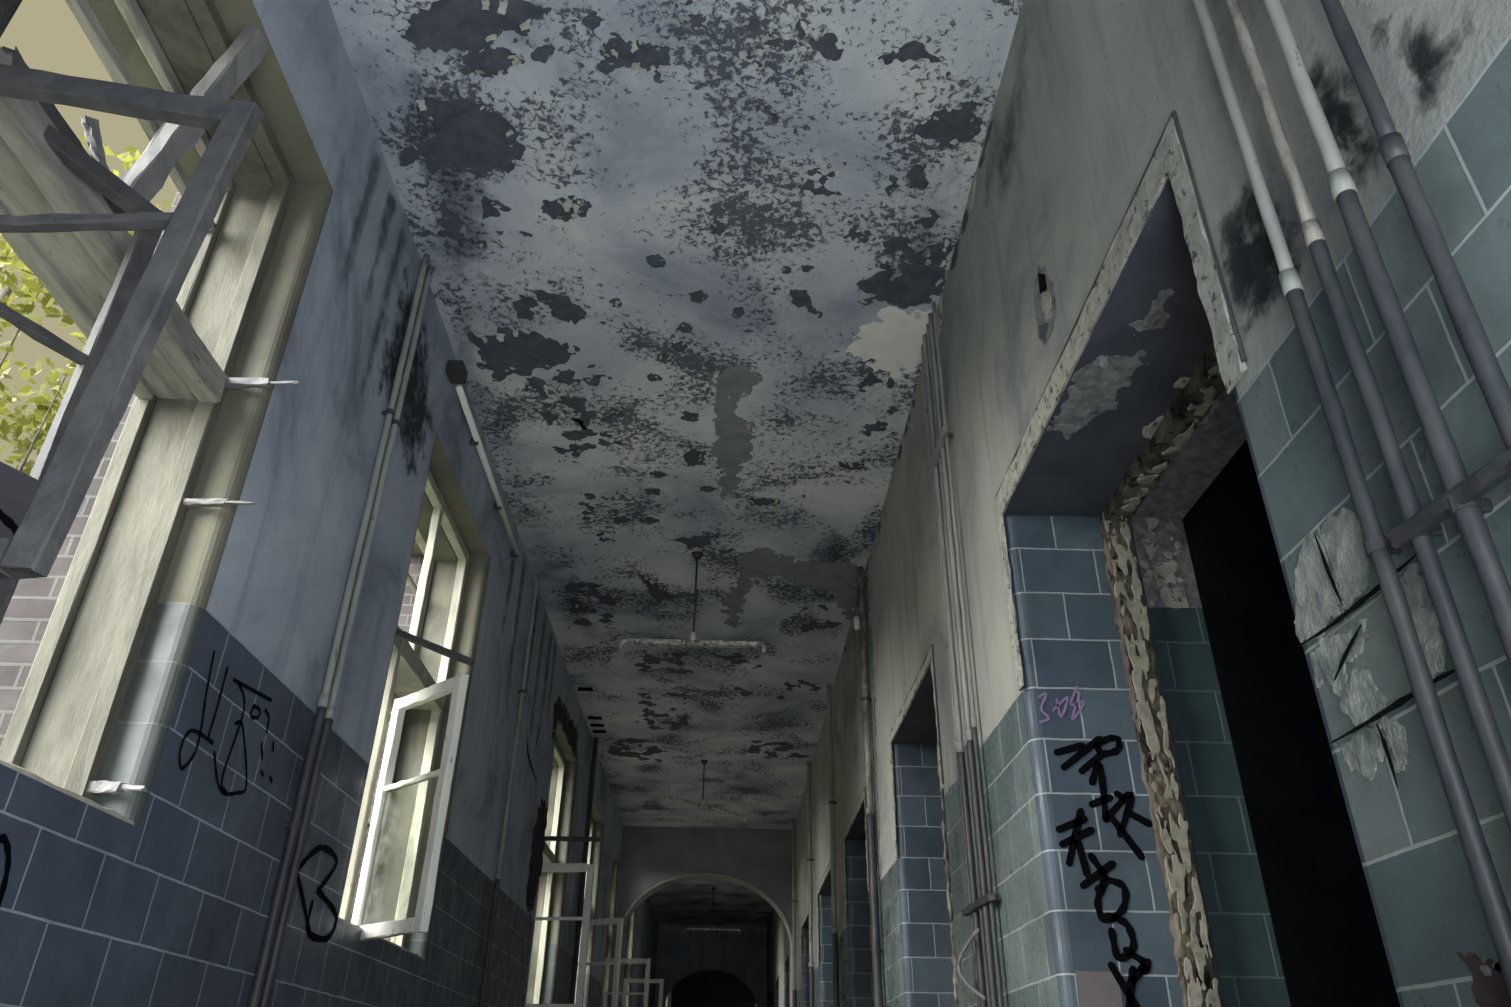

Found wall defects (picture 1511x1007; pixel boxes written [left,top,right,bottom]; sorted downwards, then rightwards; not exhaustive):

flaking render [0,0,22,38]
peeling [398,0,555,78]
peeling [582,11,671,89]
peeling [878,40,955,79]
peeling [541,195,592,222]
leakage [1222,188,1300,329]
peeling [467,290,624,465]
peeling [1046,288,1175,440]
peeling [673,100,994,888]
crack [1299,534,1416,681]
peeling [1102,364,1221,1007]
crack [1331,669,1455,788]